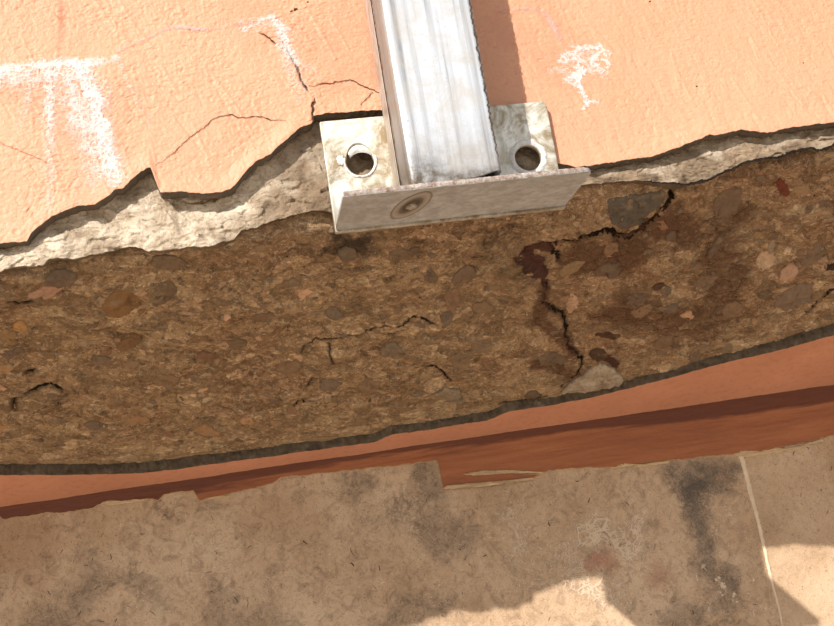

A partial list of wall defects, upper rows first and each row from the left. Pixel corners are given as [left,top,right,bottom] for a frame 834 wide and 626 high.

crack [260,33,379,122]
crack [155,114,286,166]
crack [367,315,433,331]
spalling [0,116,834,465]
crack [542,281,583,386]
damp [669,461,739,620]